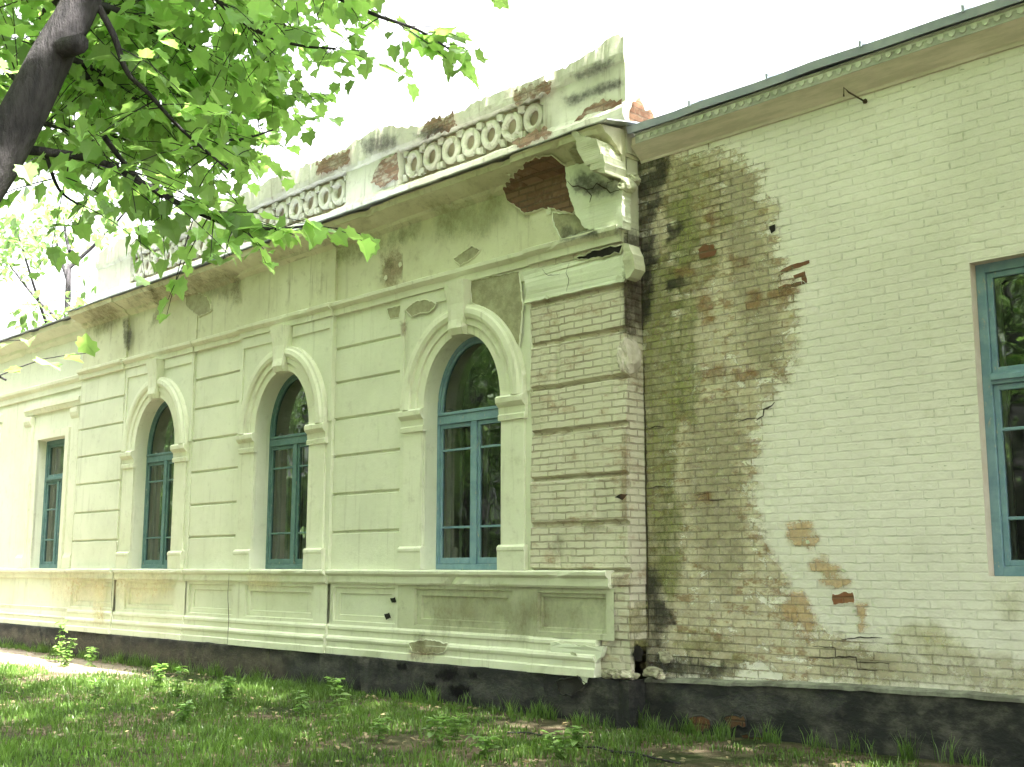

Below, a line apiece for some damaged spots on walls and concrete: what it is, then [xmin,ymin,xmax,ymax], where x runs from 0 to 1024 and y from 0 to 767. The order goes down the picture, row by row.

spalling [421,110,457,139]
spalling [514,80,552,107]
spalling [574,98,654,122]
spalling [315,149,350,176]
spalling [370,153,399,188]
spalling [502,126,591,239]
crack [567,181,619,201]
leakage [622,155,698,415]
peeling [470,143,893,681]
leakage [629,501,746,678]
spalling [408,639,448,655]
crack [809,636,889,671]